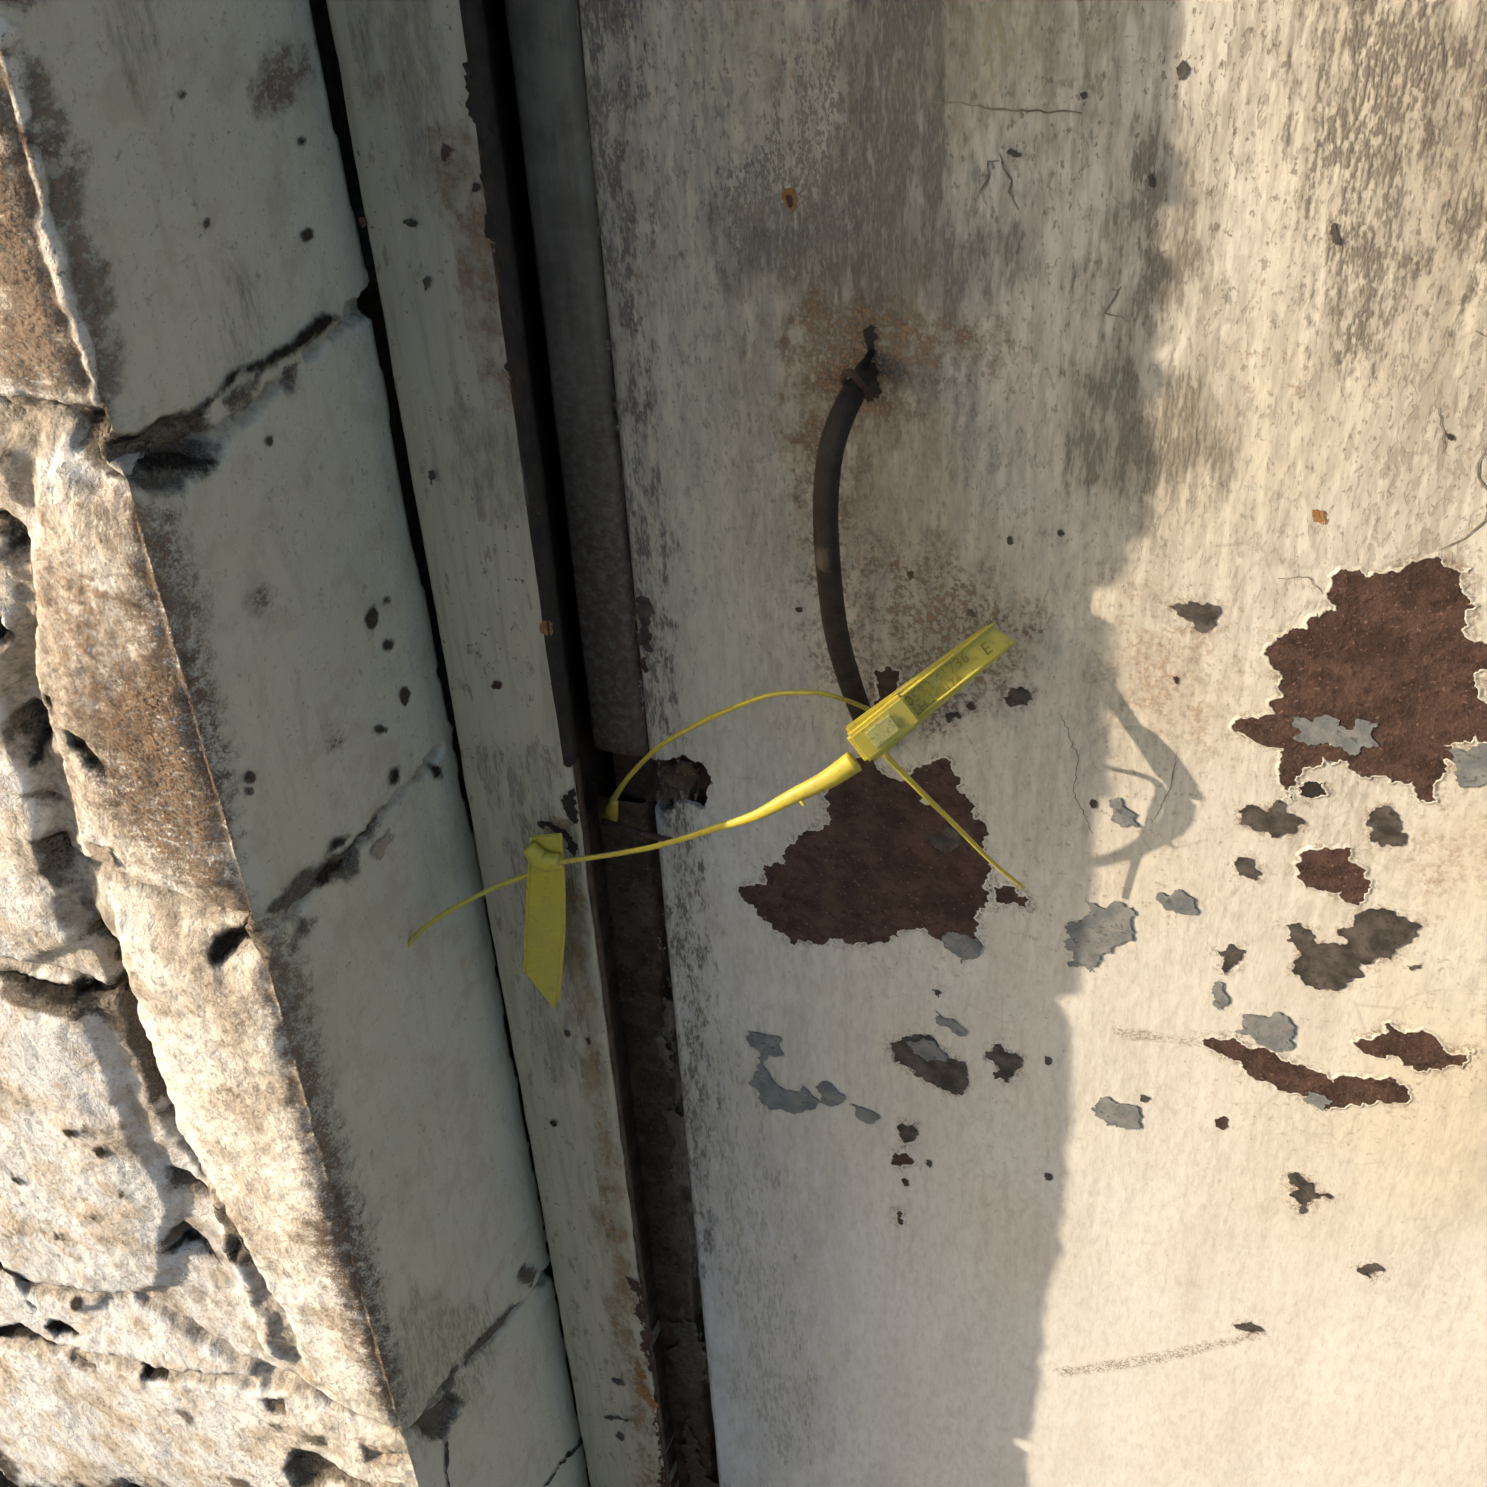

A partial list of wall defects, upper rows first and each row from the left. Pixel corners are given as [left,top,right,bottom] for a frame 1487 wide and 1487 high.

corrosion [430,134,515,404]
crack [181,289,366,418]
crack [1439,447,1487,566]
crack [1278,576,1323,594]
crack [1061,716,1094,834]
crack [1154,753,1177,820]
peeling [1228,552,1487,991]
peeling [746,1030,880,1125]
peeling [888,1123,932,1186]
peeling [1215,1116,1228,1130]
peeling [894,1208,907,1226]
peeling [1233,1322,1263,1333]